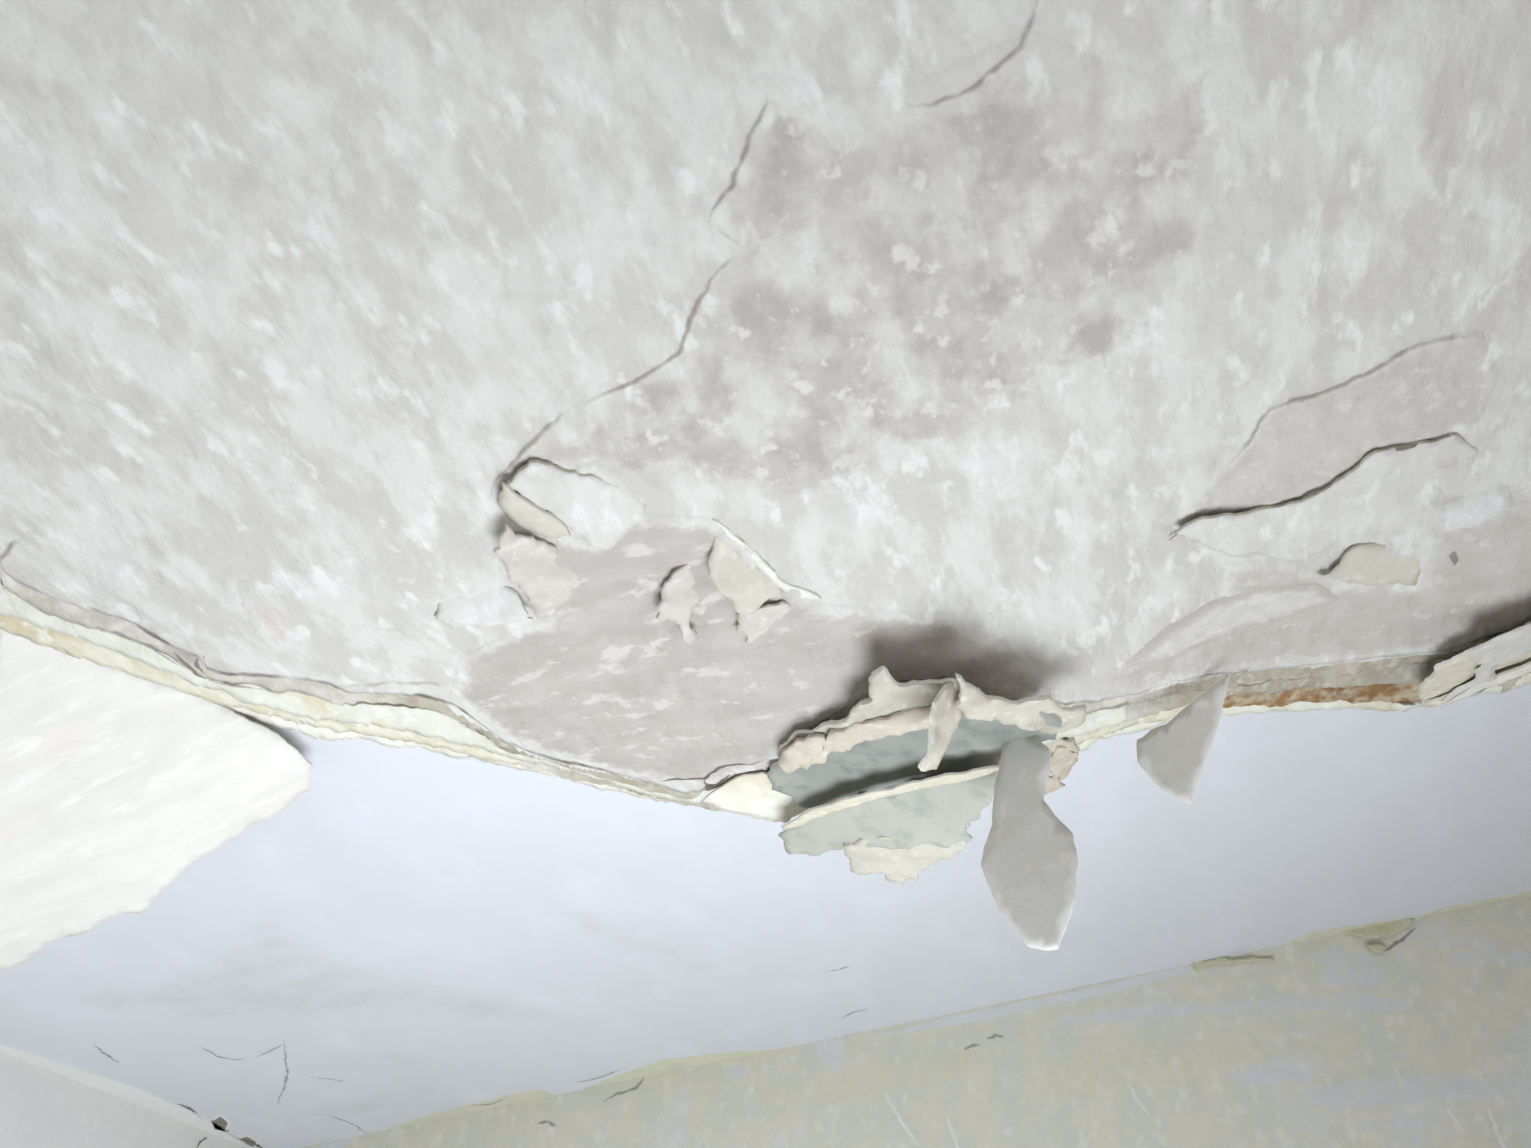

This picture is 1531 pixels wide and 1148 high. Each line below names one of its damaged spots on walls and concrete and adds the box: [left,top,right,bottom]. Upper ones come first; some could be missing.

crack [936,18,1034,105]
crack [716,113,763,207]
crack [608,281,711,394]
crack [1246,338,1456,446]
crack [497,426,551,480]
peeling [415,31,1531,953]
rust [1125,645,1474,722]
peeling [0,566,1000,970]
damp [326,683,735,813]
peeling [1194,956,1274,972]